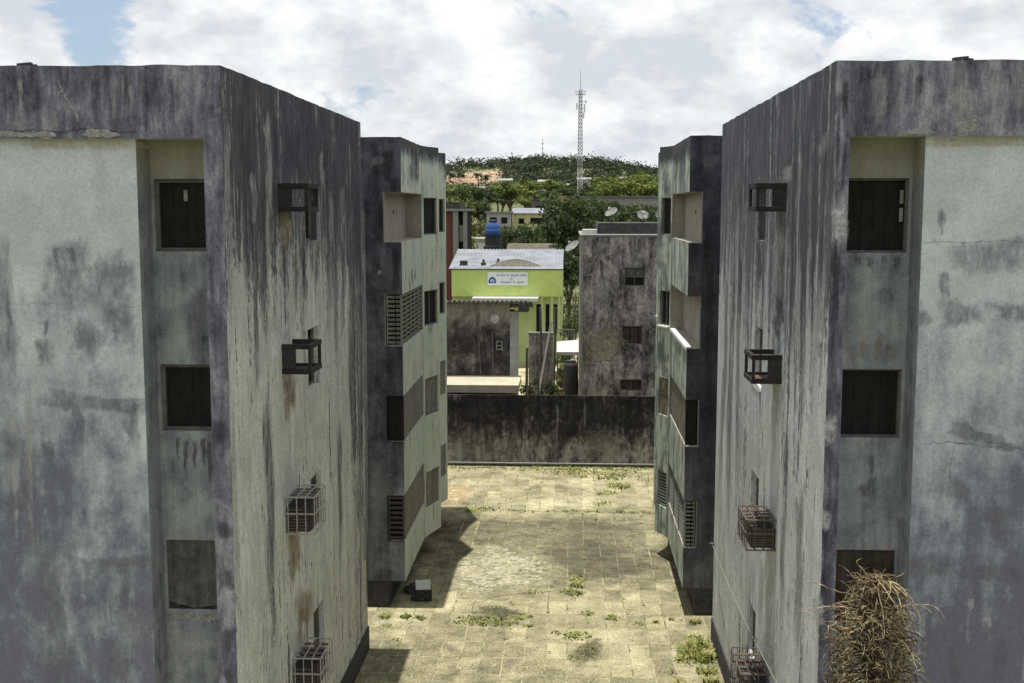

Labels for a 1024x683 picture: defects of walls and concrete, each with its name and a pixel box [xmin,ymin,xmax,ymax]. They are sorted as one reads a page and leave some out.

spalling [82,129,120,138]
water stain [242,117,368,465]
water stain [720,252,742,445]
water stain [263,422,274,597]